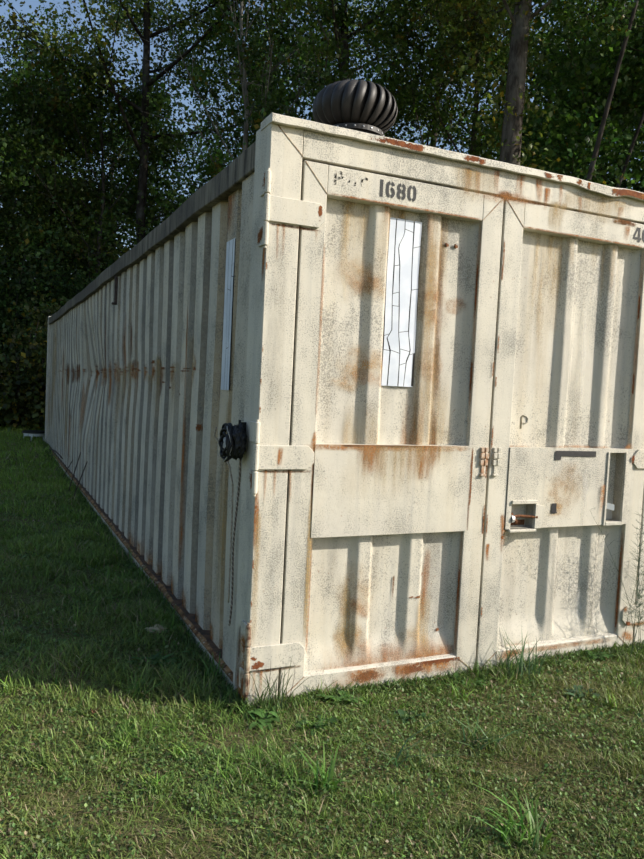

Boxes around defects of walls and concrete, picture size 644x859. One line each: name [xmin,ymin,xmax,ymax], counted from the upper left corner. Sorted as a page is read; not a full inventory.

rust [494,172,563,205]
rust [603,188,644,233]
rust [257,224,315,273]
rust [342,195,478,387]
rust [48,312,196,454]
rust [312,411,437,478]
rust [264,449,314,648]
rust [336,590,361,650]
rust [383,560,460,679]
rust [235,629,300,702]
rust [349,657,381,684]